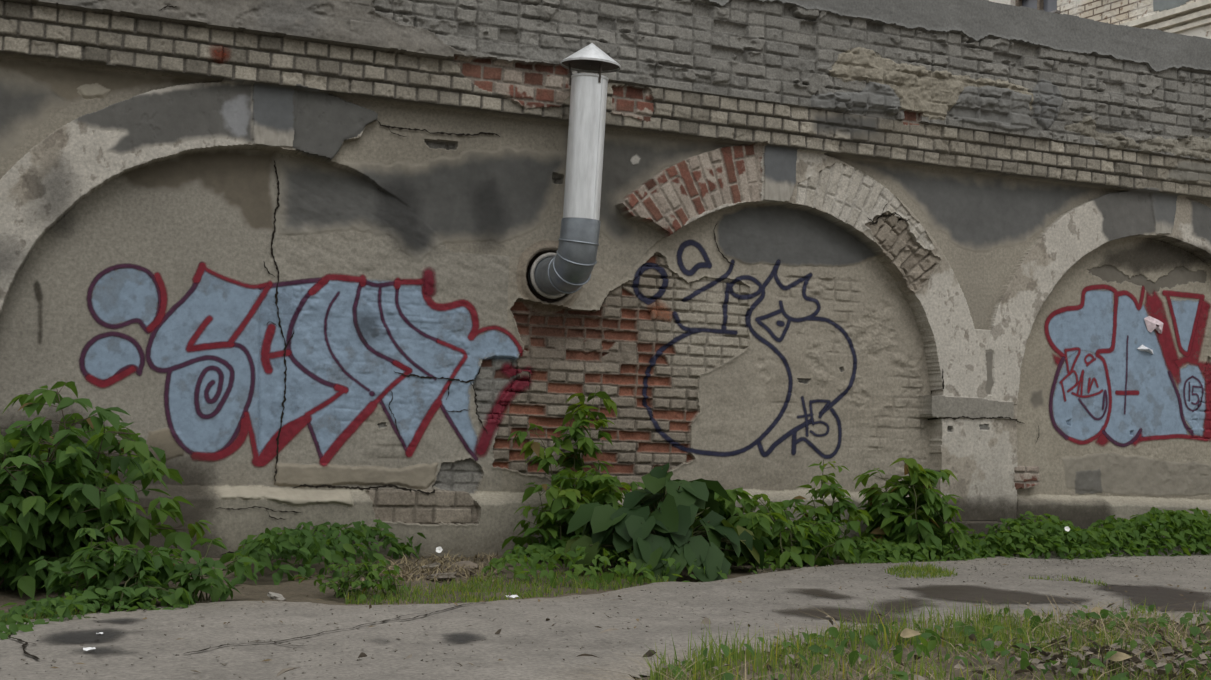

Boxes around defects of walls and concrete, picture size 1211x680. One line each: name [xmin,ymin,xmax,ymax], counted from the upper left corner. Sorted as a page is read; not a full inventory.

crack [378,121,500,137]
spalling [620,141,768,235]
spalling [373,0,1211,160]
spalling [796,162,941,292]
crack [216,161,435,520]
spalling [213,250,750,525]